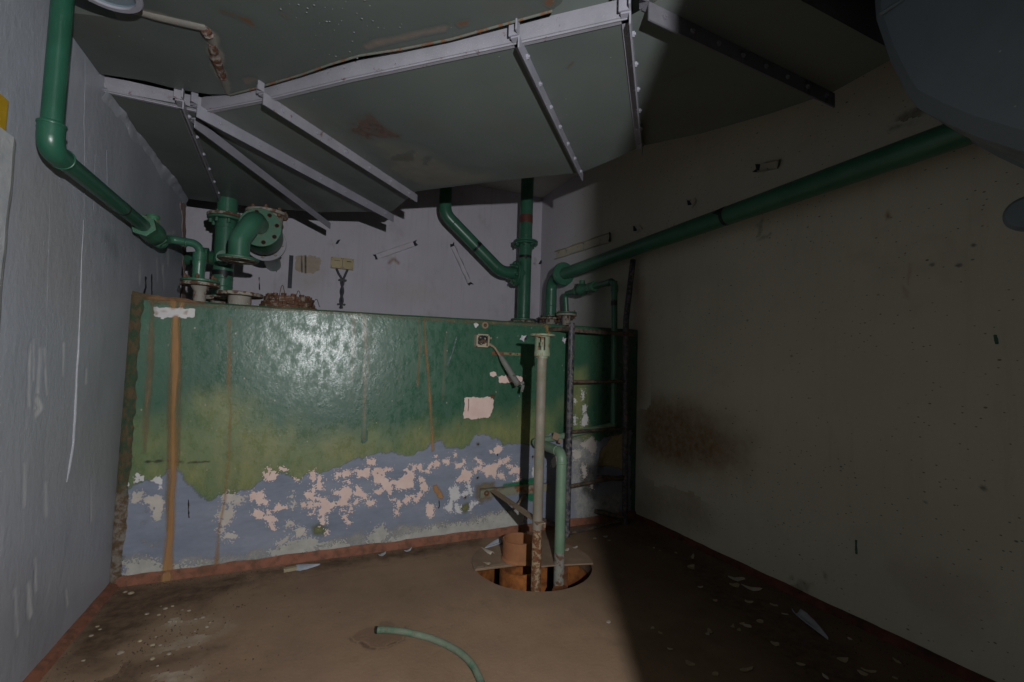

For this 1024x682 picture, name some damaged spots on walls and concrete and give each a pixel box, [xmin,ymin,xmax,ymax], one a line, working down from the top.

corrosion [149,301,221,582]
peeling [122,388,633,576]
leakage [630,269,774,545]